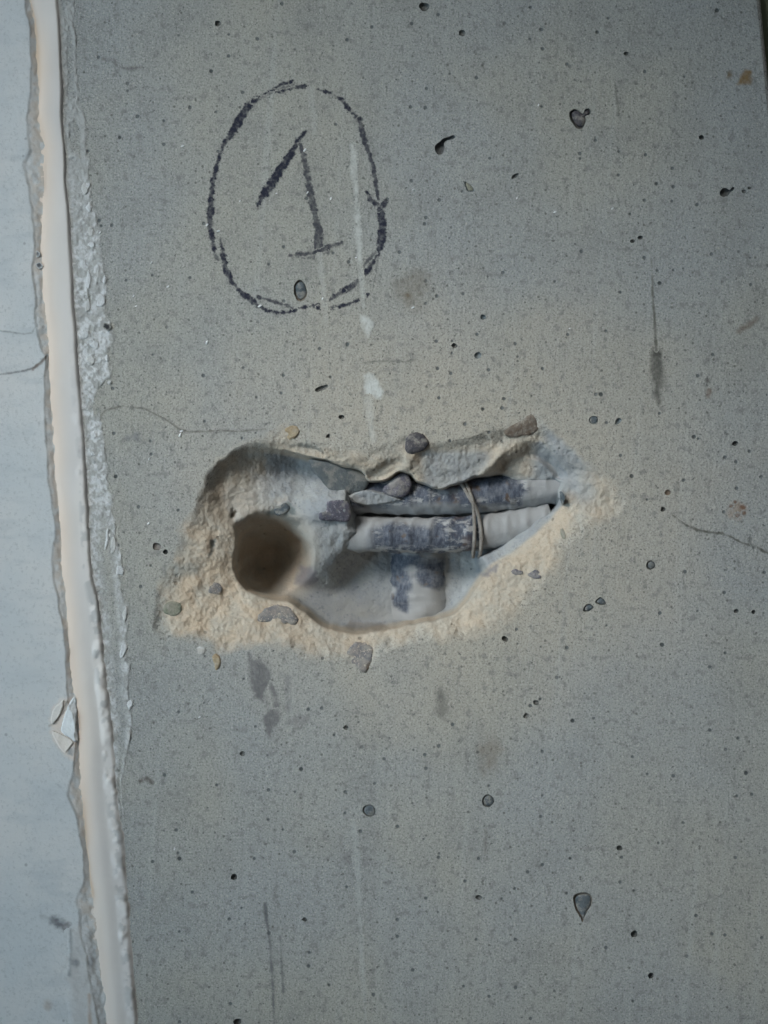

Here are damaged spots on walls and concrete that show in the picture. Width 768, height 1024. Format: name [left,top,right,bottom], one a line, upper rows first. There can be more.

spalling [148,407,630,673]
crack [671,514,768,555]